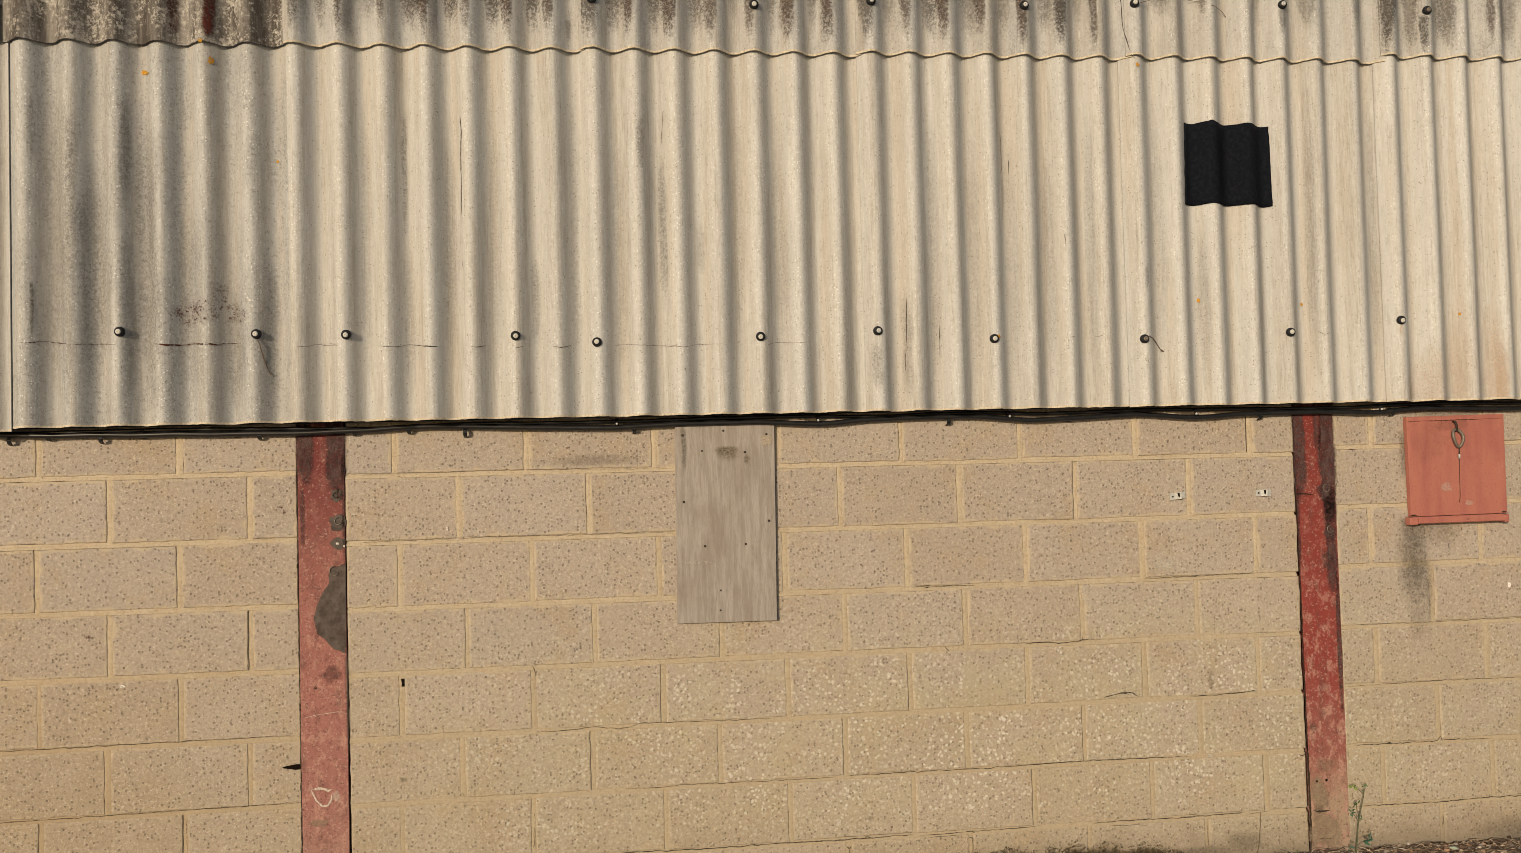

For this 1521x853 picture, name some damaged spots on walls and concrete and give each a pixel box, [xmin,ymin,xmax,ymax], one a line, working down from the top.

corrosion [202,0,215,35]
damp [401,0,427,17]
damp [487,0,552,21]
damp [581,0,631,27]
damp [650,0,675,28]
damp [781,0,793,34]
damp [822,0,832,28]
damp [936,0,948,33]
damp [1016,0,1027,37]
damp [1054,0,1066,34]
damp [1378,0,1395,42]
peeling [296,423,346,653]